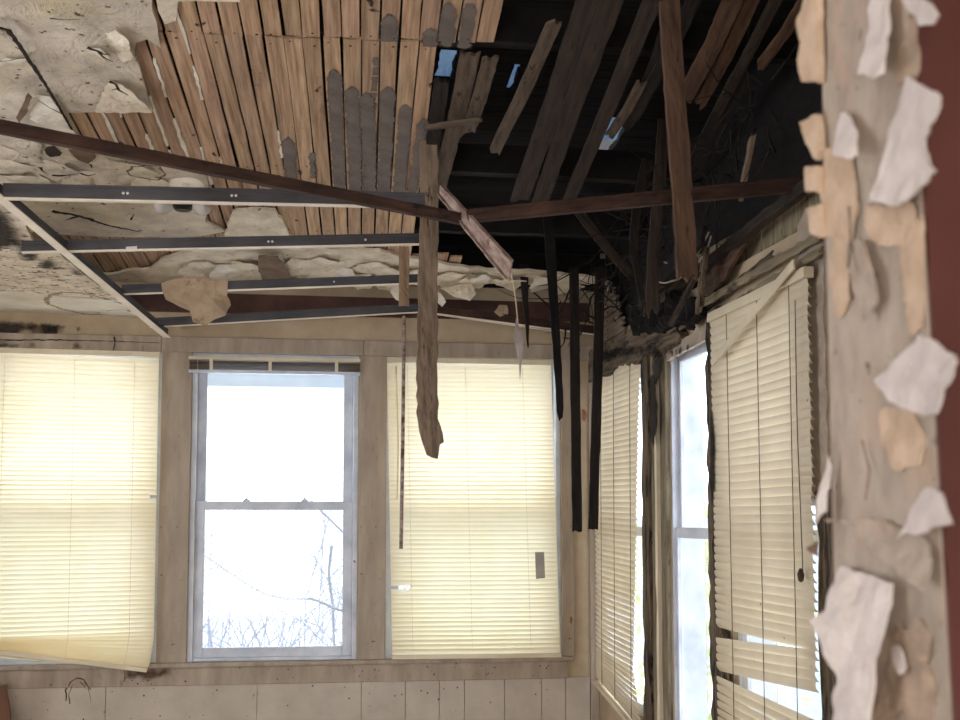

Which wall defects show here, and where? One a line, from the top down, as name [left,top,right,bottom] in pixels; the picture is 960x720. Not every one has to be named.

flaking render [0,0,240,135]
water stain [327,57,428,192]
flaking render [0,135,209,188]
water stain [0,212,54,269]
crack [52,210,140,232]
flaking render [21,201,291,238]
peeling [796,0,959,471]
flaking render [103,247,419,301]
flaking render [437,260,612,306]
water stain [0,322,62,334]
peeling [494,305,508,317]
peeling [809,456,953,720]